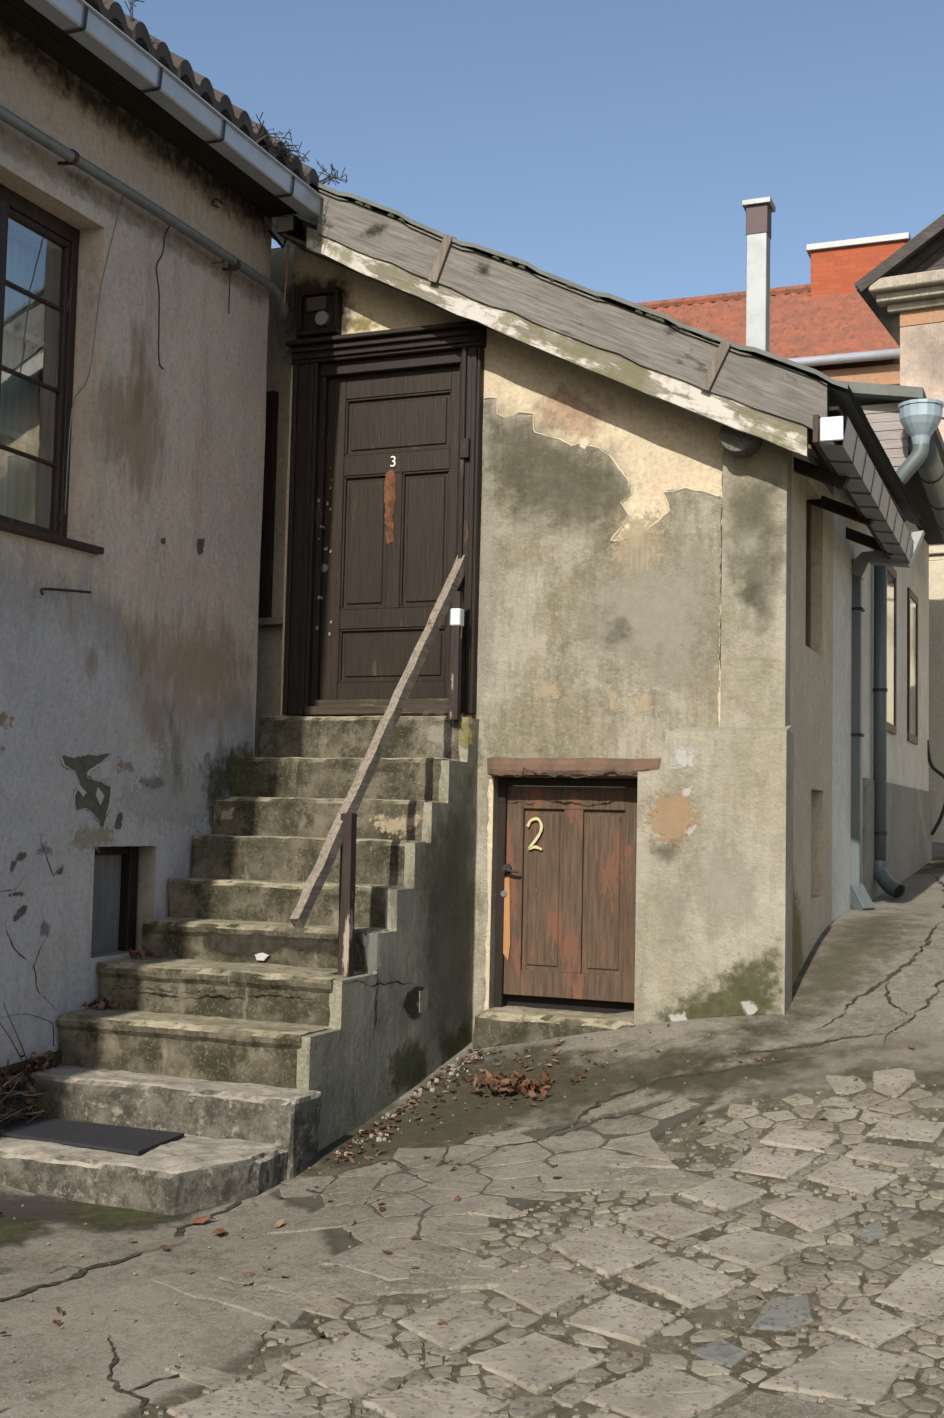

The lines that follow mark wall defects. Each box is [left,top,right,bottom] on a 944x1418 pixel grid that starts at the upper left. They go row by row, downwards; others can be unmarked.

peeling [472,397,723,1037]
flaking render [59,753,164,850]
flaking render [11,847,50,872]
flaking render [9,892,27,921]
crack [124,1368,212,1411]